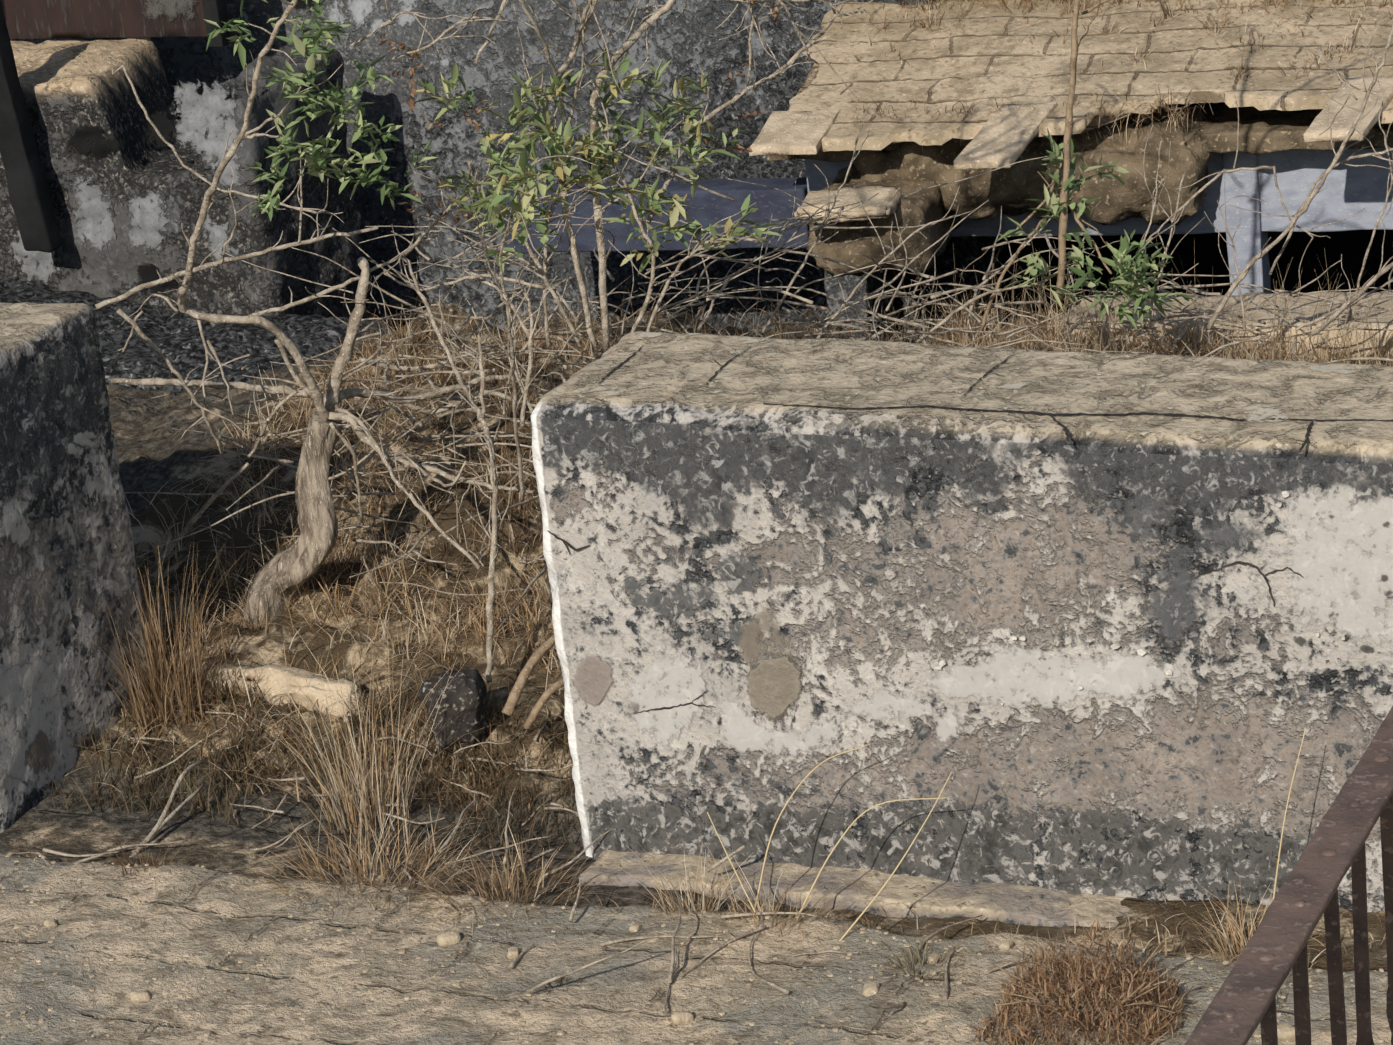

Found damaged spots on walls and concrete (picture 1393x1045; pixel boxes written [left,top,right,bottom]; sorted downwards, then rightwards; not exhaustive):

crack [763,352,1393,451]
damp [540,418,1393,537]
damp [622,550,763,645]
damp [1152,554,1207,644]
crack [1195,561,1304,607]
flaking render [573,611,1182,756]
damp [588,795,1309,903]